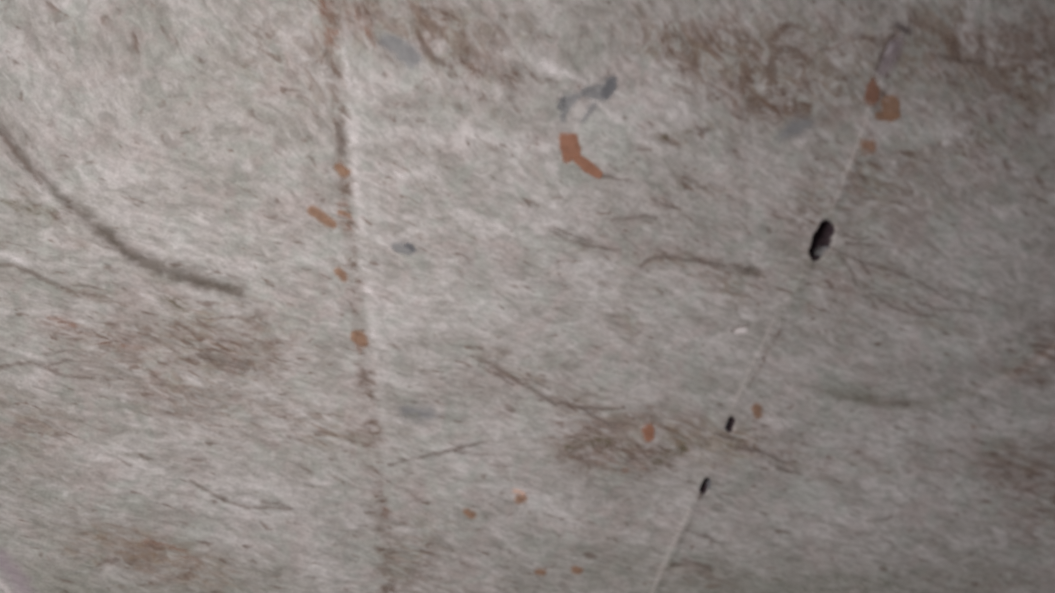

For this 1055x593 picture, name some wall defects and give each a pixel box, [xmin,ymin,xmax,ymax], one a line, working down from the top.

rust [865,78,899,120]
rust [560,134,602,178]
rust [308,207,350,227]
rust [352,331,367,346]
rust [642,425,654,441]